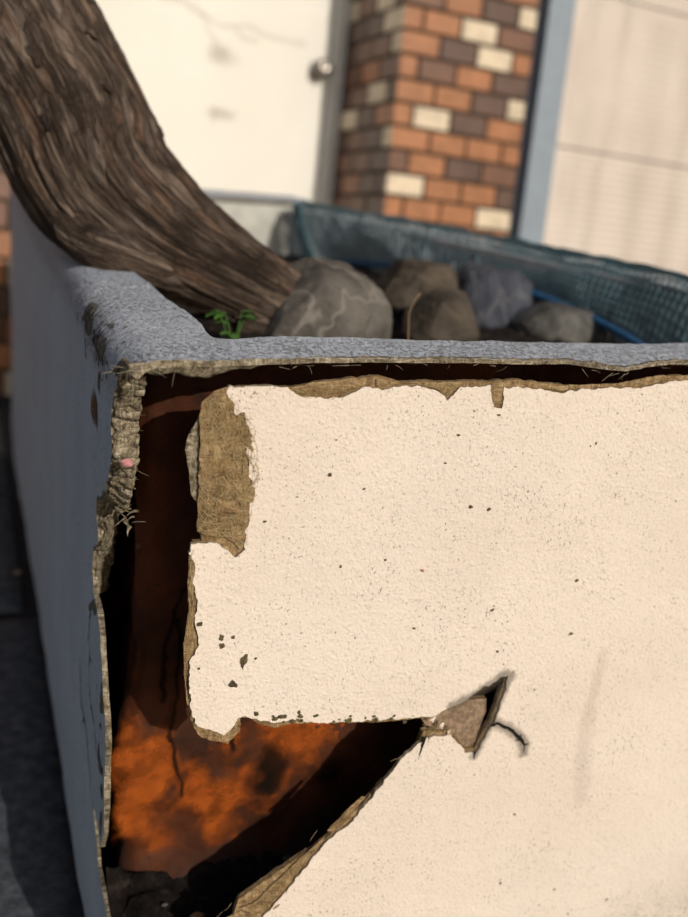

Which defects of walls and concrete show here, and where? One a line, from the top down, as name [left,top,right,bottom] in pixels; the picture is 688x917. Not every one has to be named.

spalling [275,356,688,416]
spalling [77,302,261,616]
spalling [183,551,203,706]
peeling [271,710,319,724]
peeling [389,695,486,747]
crack [491,722,529,753]
spalling [219,793,371,917]